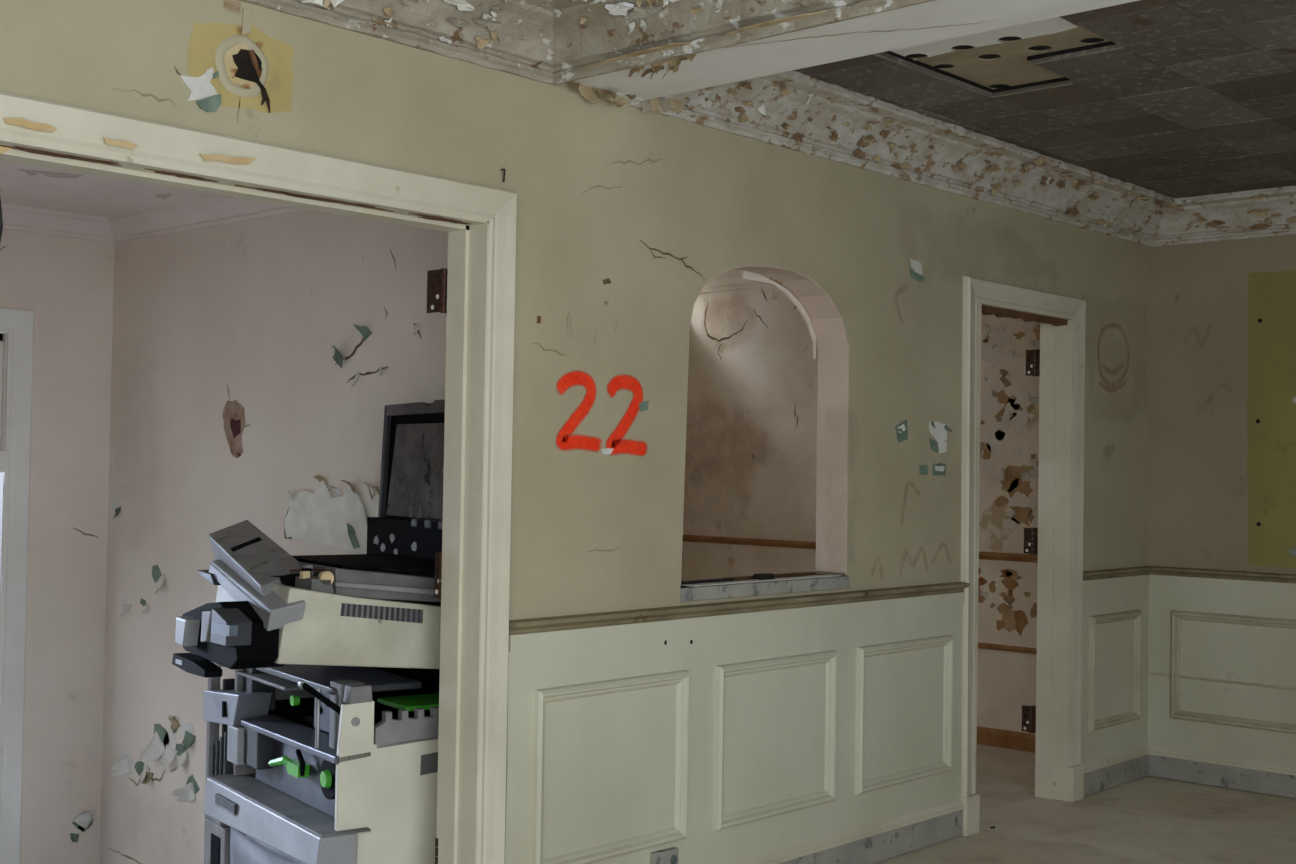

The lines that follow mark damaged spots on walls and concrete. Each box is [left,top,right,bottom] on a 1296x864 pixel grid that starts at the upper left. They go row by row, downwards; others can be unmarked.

spalling [174,8,270,122]
peeling [300,0,344,10]
peeling [372,0,513,50]
peeling [568,43,696,114]
peeling [573,0,722,34]
peeling [726,82,815,142]
peeling [827,108,953,172]
peeling [724,10,1124,98]
peeling [954,156,1178,235]
flaking render [222,385,251,458]
peeling [979,321,1040,529]
peeling [978,567,1037,636]